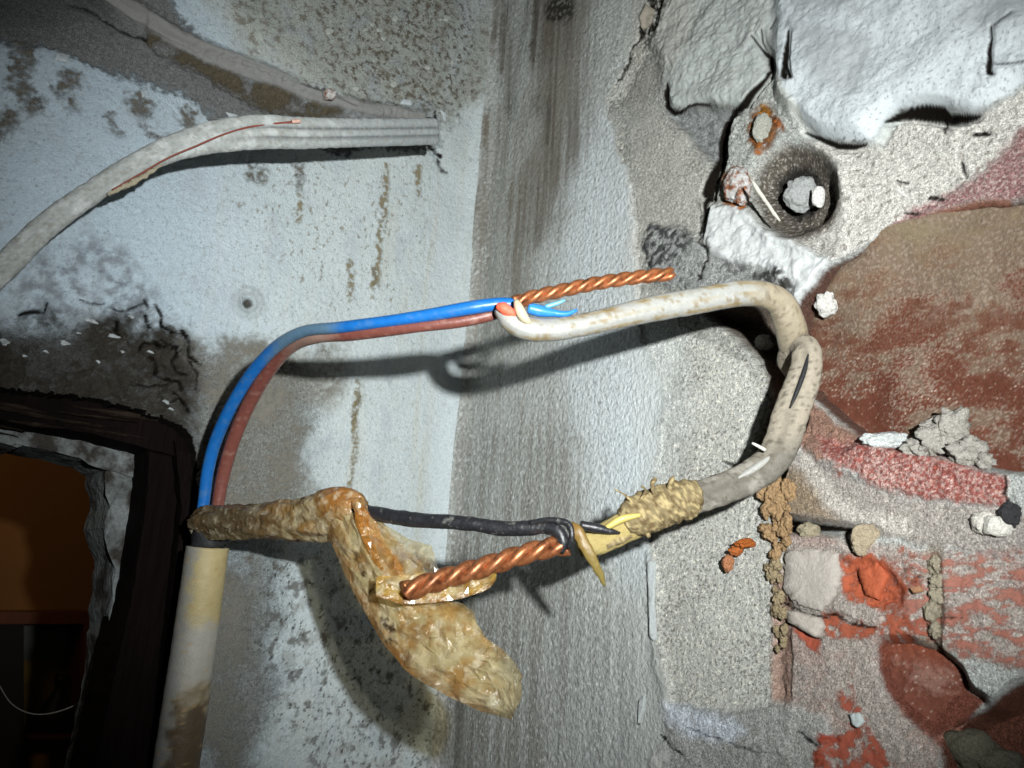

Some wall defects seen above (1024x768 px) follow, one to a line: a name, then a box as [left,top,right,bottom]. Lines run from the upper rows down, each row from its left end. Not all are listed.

leakage [531,0,578,186]
flaking render [666,105,733,162]
corrosion [748,105,784,154]
flaking render [803,88,1024,261]
crack [18,302,48,316]
crack [114,300,198,413]
flaking render [640,318,769,485]
flaking render [647,475,1024,722]
spalling [814,686,889,768]